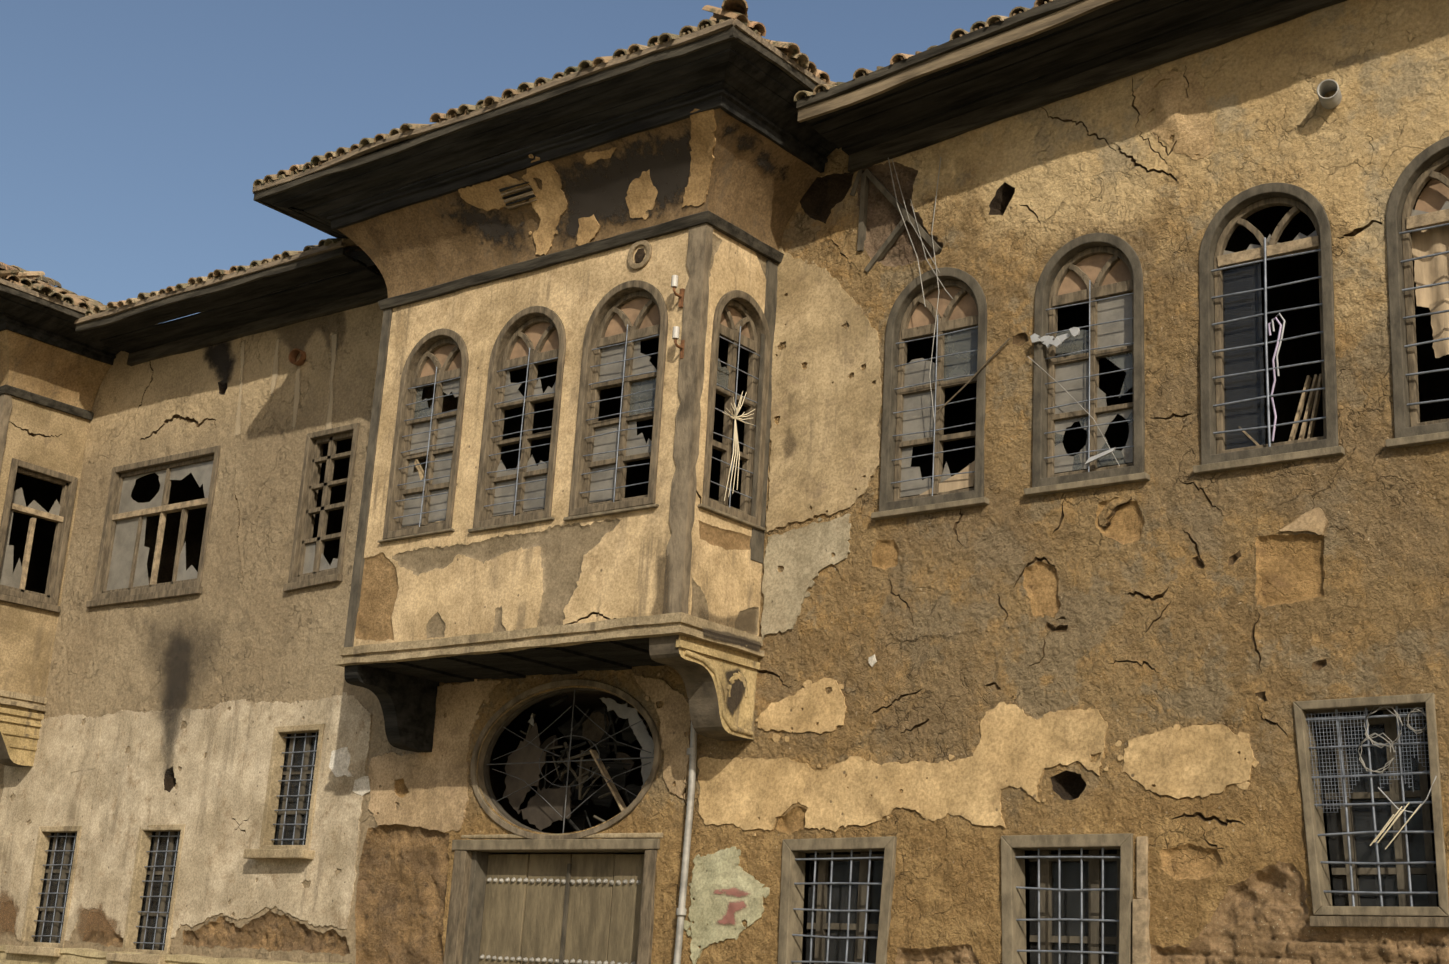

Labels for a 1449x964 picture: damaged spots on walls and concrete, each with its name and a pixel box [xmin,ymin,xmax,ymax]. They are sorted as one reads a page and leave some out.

peeling [458,154,601,255]
peeling [625,170,658,219]
peeling [682,109,717,208]
crack [1042,78,1208,207]
crack [134,360,246,591]
peeling [698,246,882,640]
flaking render [355,518,622,641]
flaking render [1228,507,1328,608]
peeling [634,673,1259,836]
peeling [0,679,501,964]
peeling [684,846,770,964]
flaking render [1150,861,1449,964]